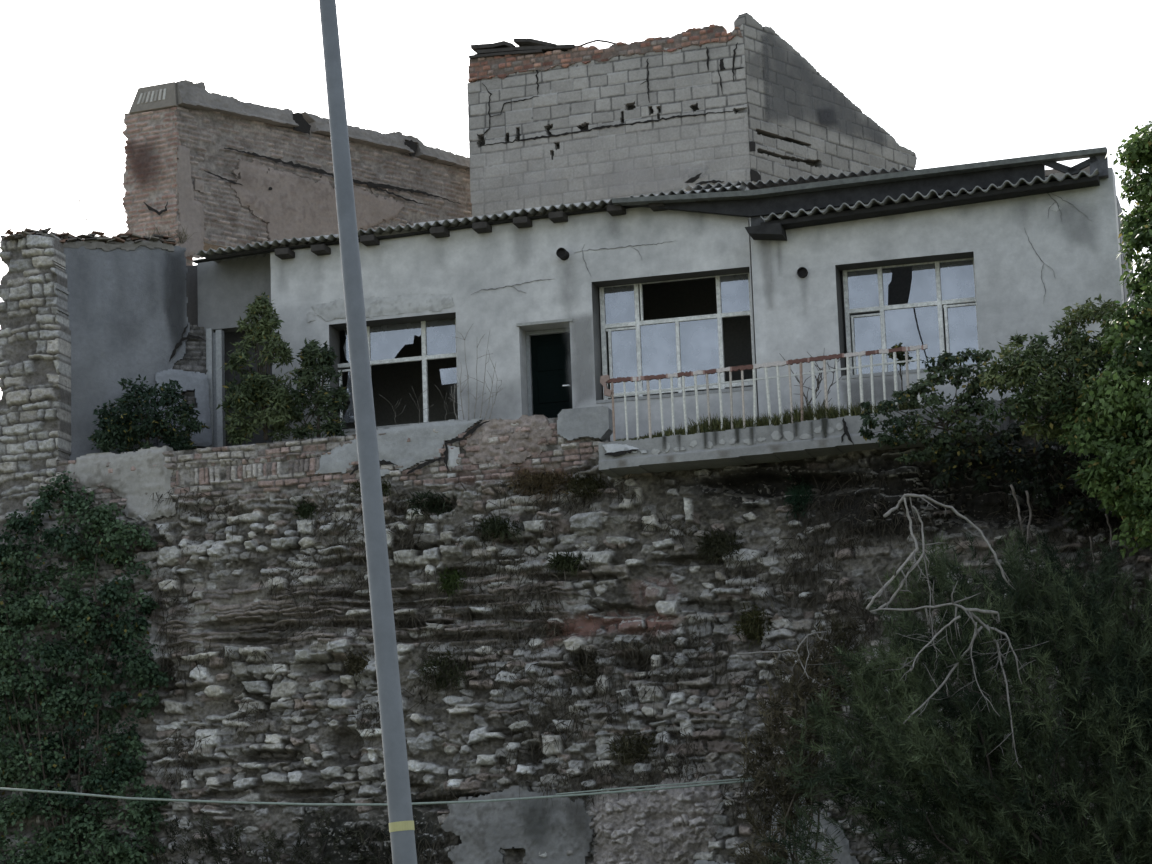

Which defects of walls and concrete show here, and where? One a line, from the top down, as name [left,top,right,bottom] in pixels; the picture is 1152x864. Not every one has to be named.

hole [293,113,311,135]
spalling [404,140,418,156]
crack [479,43,750,156]
flaking render [230,159,339,244]
flaking render [353,187,404,231]
crack [575,241,672,275]
crack [1024,193,1092,303]
flaking render [67,446,178,522]
flaking render [315,439,358,474]
flaking render [376,415,553,478]